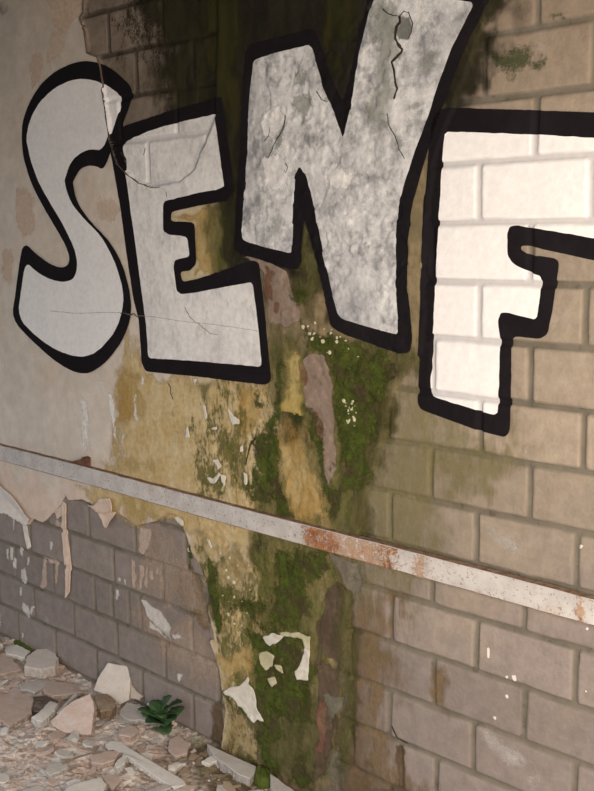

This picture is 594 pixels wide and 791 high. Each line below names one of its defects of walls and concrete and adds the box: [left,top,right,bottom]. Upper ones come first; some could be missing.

flaking render [47,0,179,186]
crack [101,90,167,197]
damp [112,0,367,274]
crack [383,9,413,159]
damp [99,331,324,524]
peeling [300,354,347,484]
flaking render [26,694,97,782]
flaking render [0,486,264,744]
damp [76,485,319,789]
peeling [259,582,346,782]
rust [294,525,399,570]
damp [326,586,411,791]